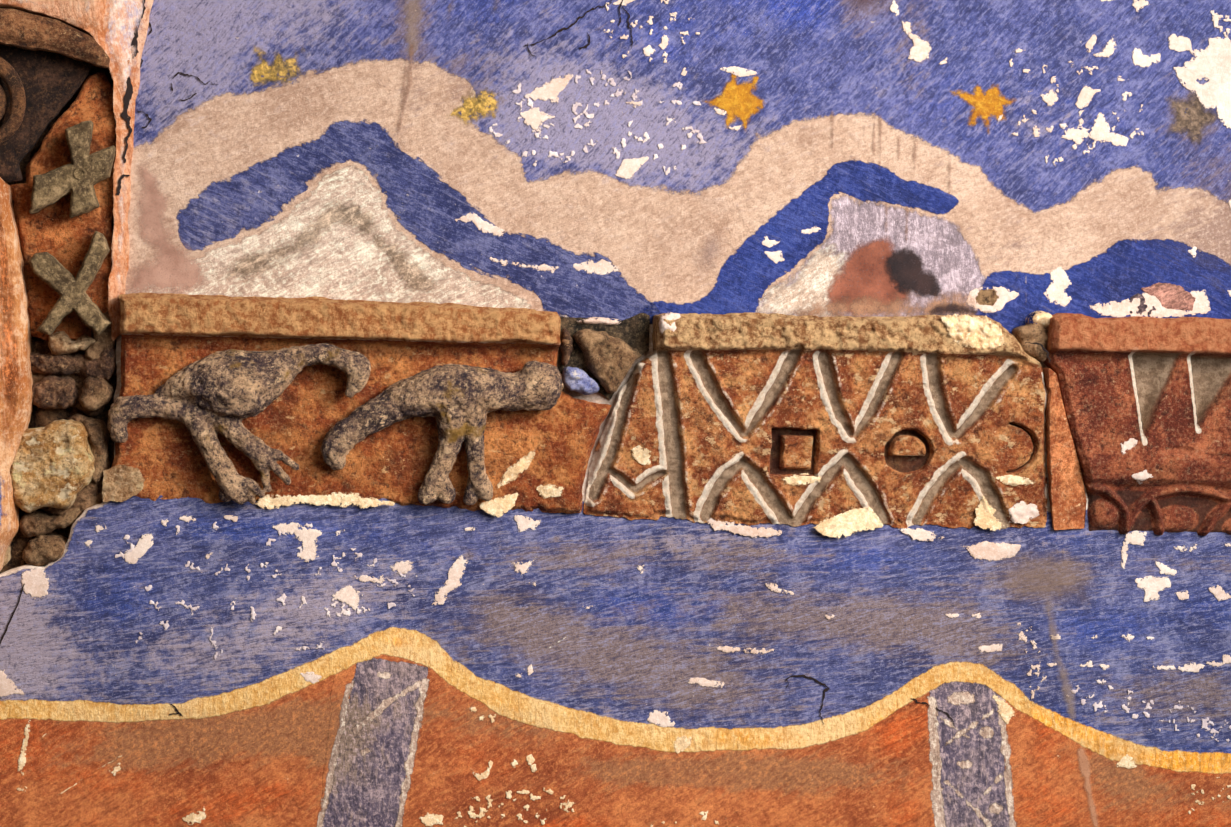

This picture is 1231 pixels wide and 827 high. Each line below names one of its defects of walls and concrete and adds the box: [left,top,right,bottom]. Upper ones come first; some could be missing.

crack [525,0,633,56]
crack [116,0,152,195]
crack [171,72,219,101]
peeling [489,0,700,179]
peeling [1132,10,1231,128]
peeling [115,515,196,564]
peeling [255,492,415,618]
peeling [432,555,468,605]
peeling [1121,530,1147,569]
peeling [1135,561,1189,602]
crack [786,675,831,724]
peeling [419,787,574,827]